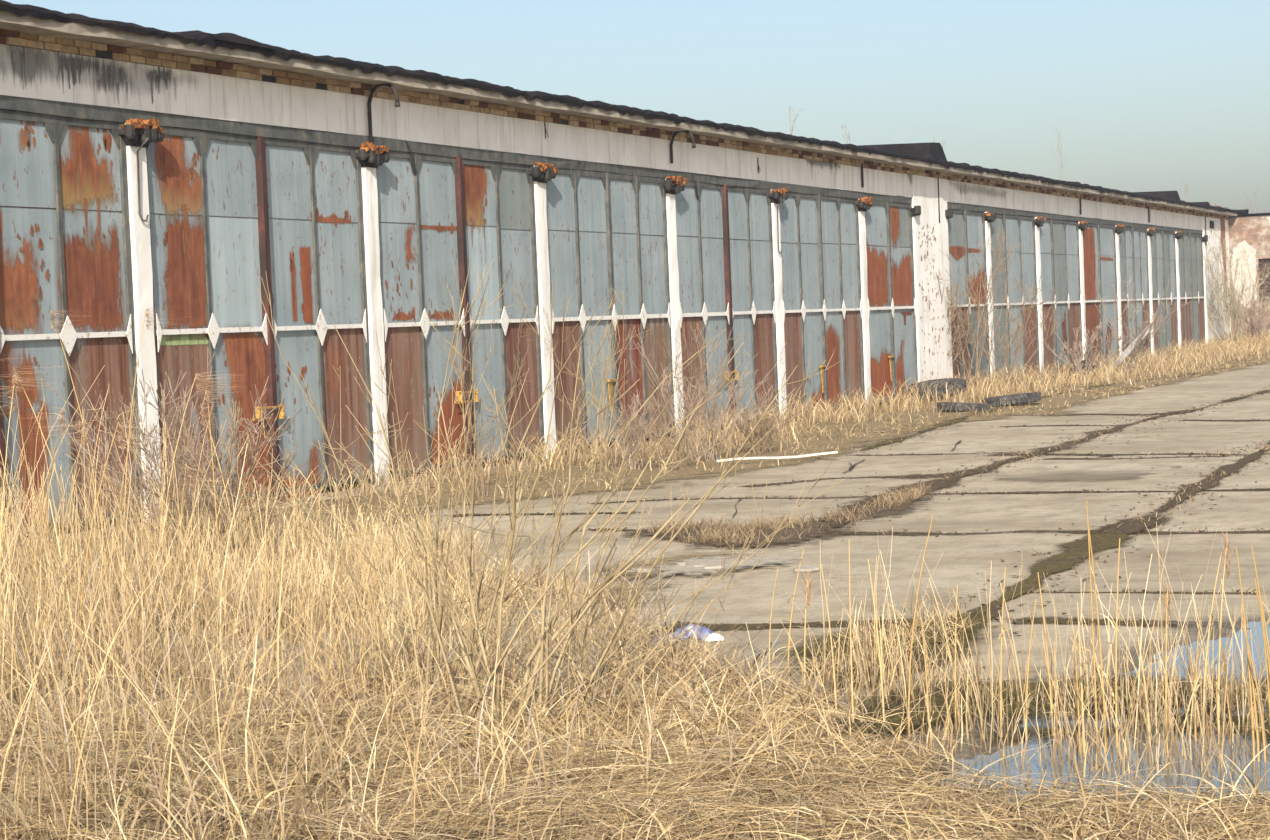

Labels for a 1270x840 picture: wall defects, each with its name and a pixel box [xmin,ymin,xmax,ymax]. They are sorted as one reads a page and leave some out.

damp [55,51,132,104]
damp [148,66,171,103]
rust [0,126,124,534]
rust [155,127,207,329]
rust [290,247,313,323]
rust [385,164,487,321]
rust [807,326,841,415]
rust [870,341,905,405]
rust [866,206,913,325]
rust [1083,226,1113,365]
flaking render [1210,217,1257,308]
rust [429,378,466,476]